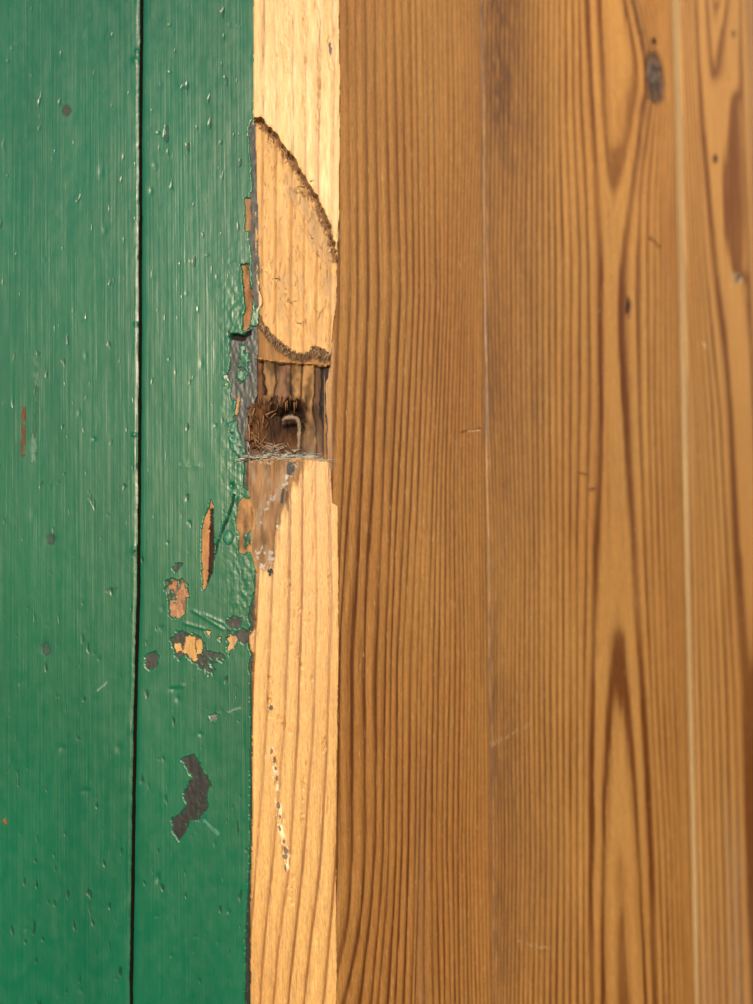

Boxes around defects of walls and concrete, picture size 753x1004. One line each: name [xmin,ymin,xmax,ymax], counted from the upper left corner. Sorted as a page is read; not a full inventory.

peeling [165,563,189,618]
spalling [201,500,215,590]
peeling [170,577,256,1004]
spalling [223,117,338,554]